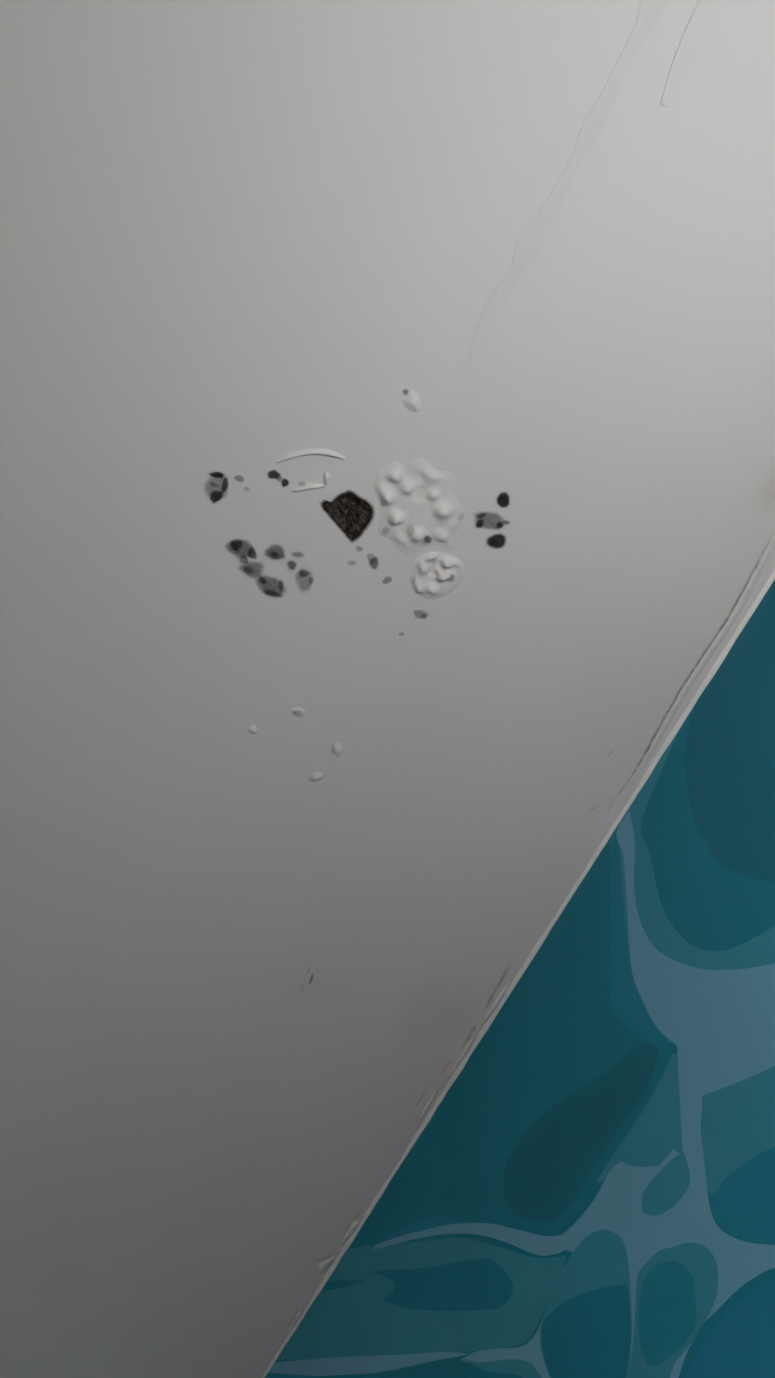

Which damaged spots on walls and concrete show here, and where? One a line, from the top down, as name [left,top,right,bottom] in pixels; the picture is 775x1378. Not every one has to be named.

water stain [210,472,228,503]
water stain [268,470,289,487]
spalling [276,448,374,542]
water stain [476,493,509,548]
water stain [227,540,313,596]